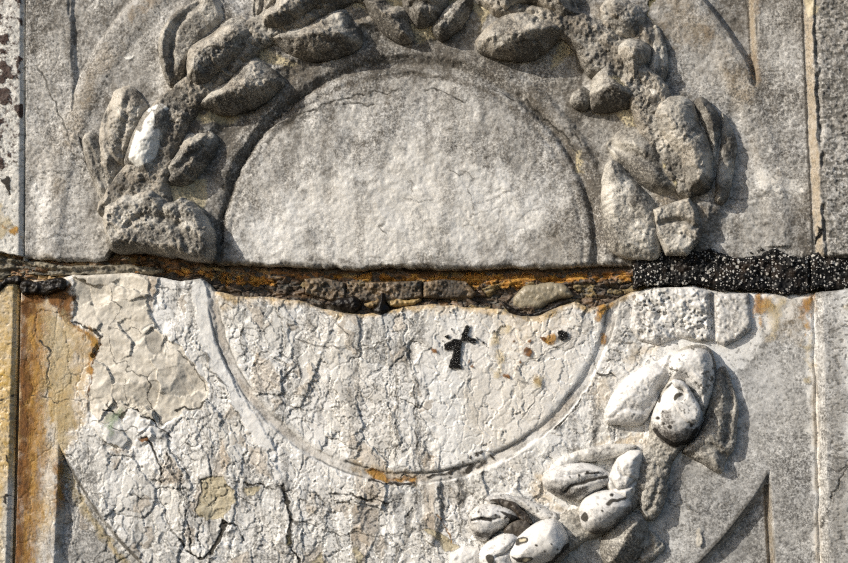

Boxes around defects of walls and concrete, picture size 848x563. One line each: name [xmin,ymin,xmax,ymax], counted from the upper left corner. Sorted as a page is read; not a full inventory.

rust [354,272,633,290]
crack [0,340,82,404]
rust [15,284,98,563]
spalling [70,273,209,426]
crack [103,404,248,527]
spalling [139,437,264,560]
crack [202,351,226,401]
crack [240,297,433,563]
crack [456,480,464,538]
crack [518,329,616,430]
crack [820,445,848,527]